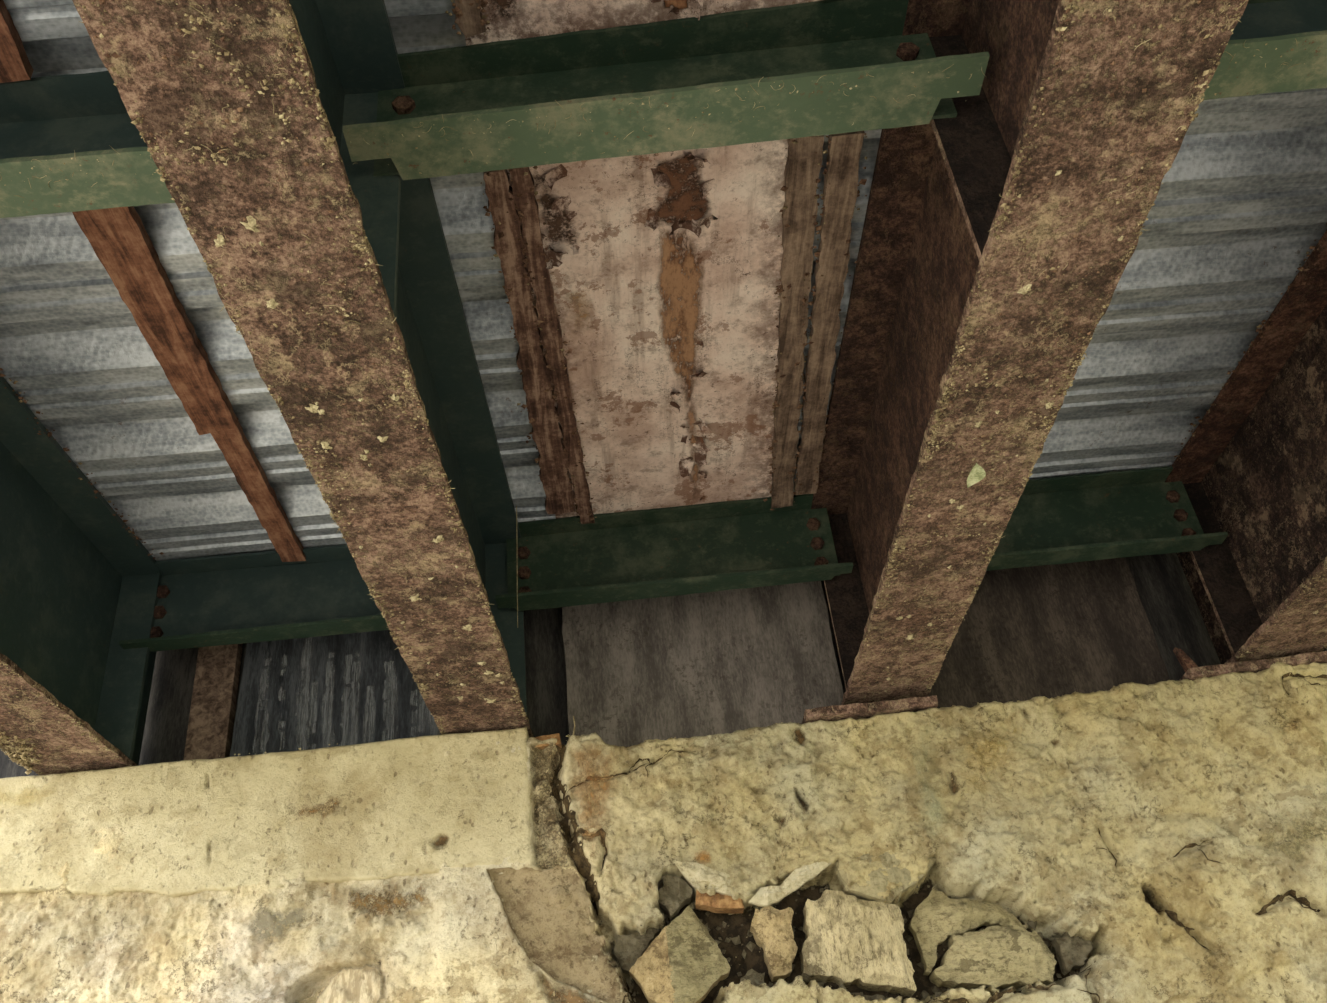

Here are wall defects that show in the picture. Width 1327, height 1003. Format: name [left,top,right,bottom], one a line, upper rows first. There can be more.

peeling [650,0,707,20]
peeling [644,153,718,500]
peeling [794,728,806,744]
crack [550,744,696,916]
peeling [486,743,649,1003]
crack [619,976,635,1003]
spalling [664,852,949,1003]
crack [927,961,1100,1003]
spalling [1007,908,1091,982]
crack [1256,889,1320,915]